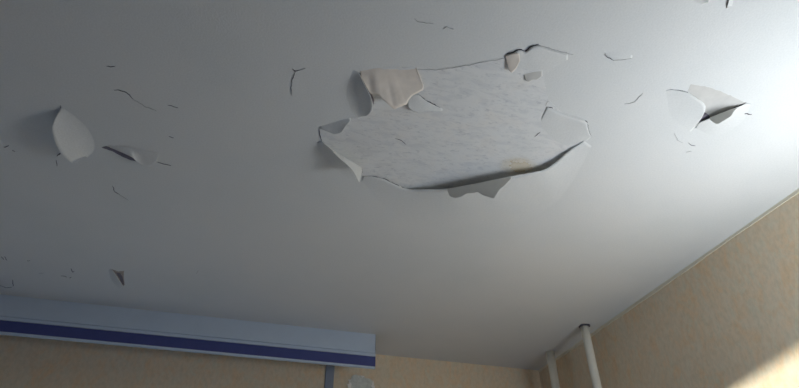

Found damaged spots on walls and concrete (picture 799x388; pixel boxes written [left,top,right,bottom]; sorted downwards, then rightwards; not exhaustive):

peeling [52,106,171,167]
peeling [317,44,591,234]
peeling [666,84,752,135]